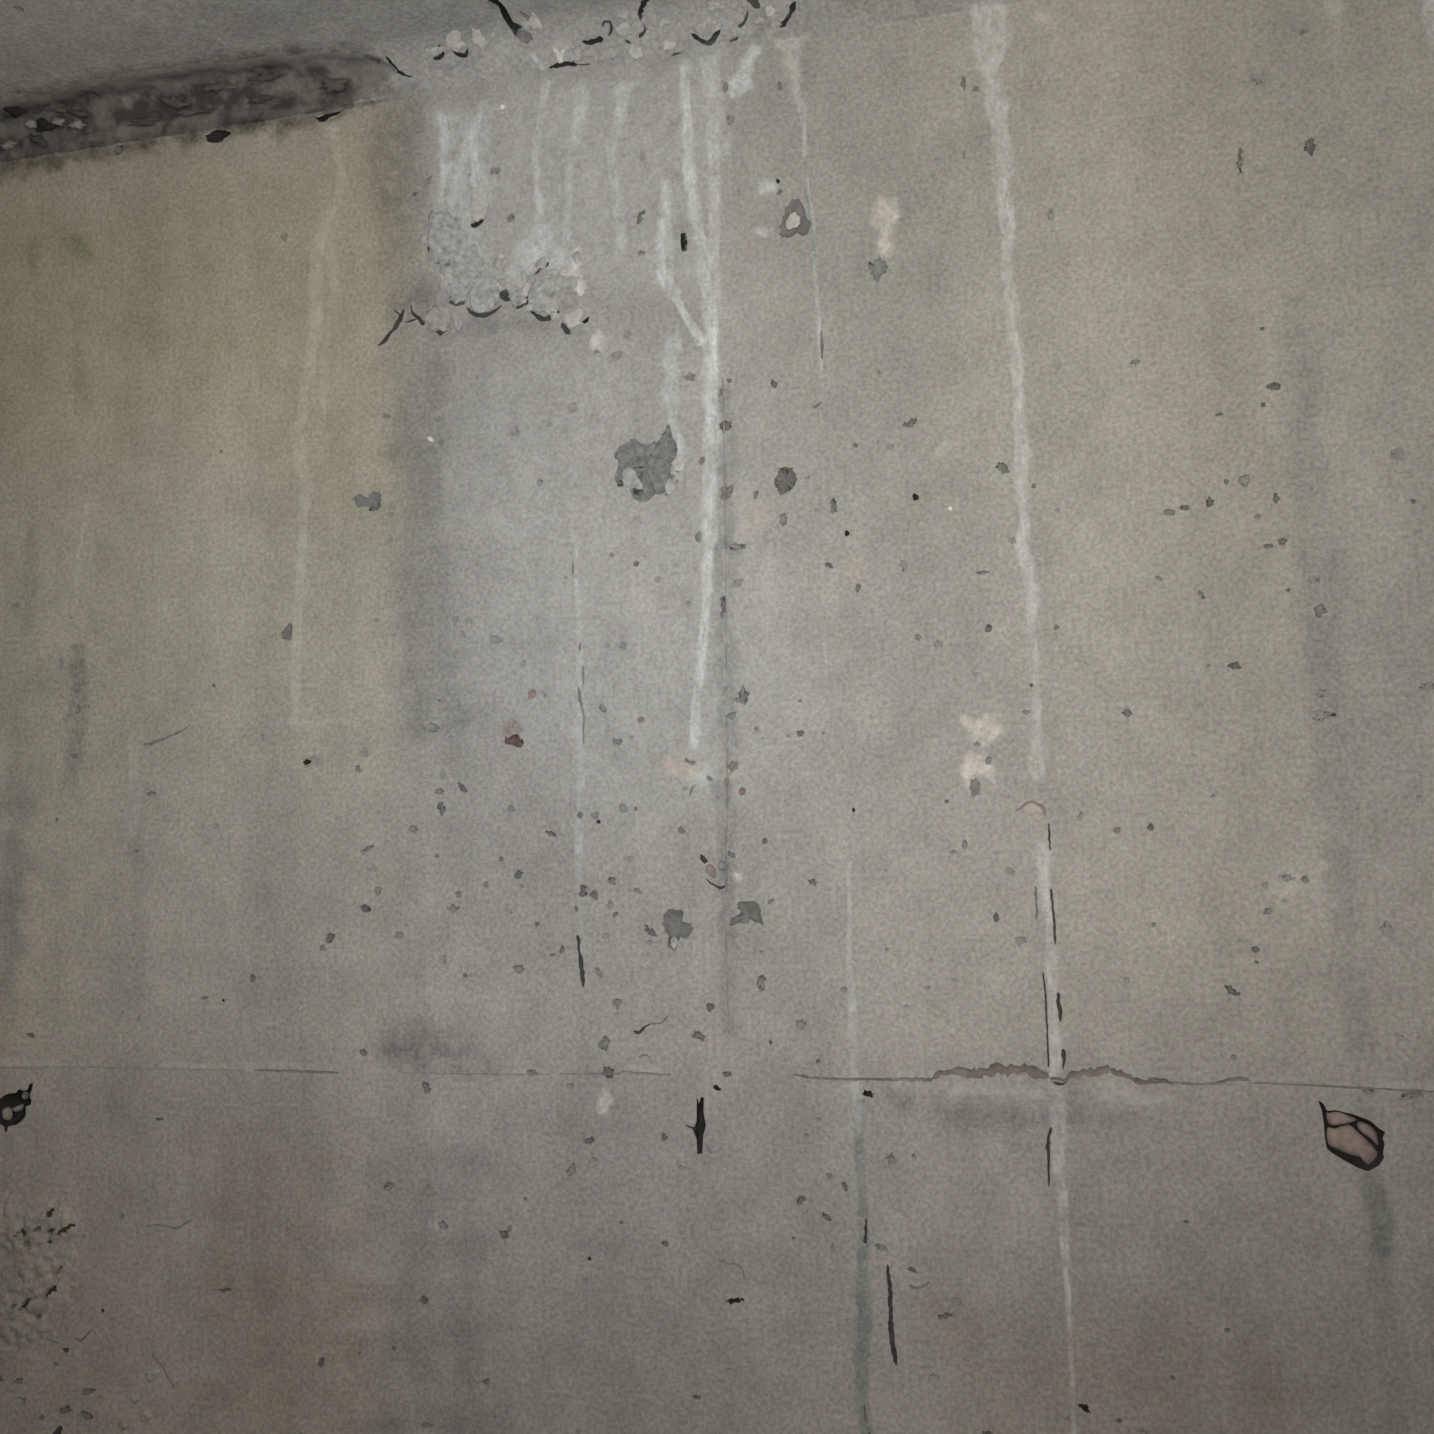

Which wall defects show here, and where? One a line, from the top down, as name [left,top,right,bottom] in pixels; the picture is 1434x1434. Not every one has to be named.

spalling [763,179,811,238]
water stain [378,179,601,346]
spalling [614,424,705,520]
crack [1045,823,1053,851]
crack [792,886,1434,1093]
crack [399,1015,671,1076]
spalling [2,1091,29,1120]
crack [1045,1127,1053,1186]
spalling [1326,1112,1378,1165]
peeling [21,1208,75,1246]
peeling [15,1268,62,1318]
crack [886,1264,929,1366]